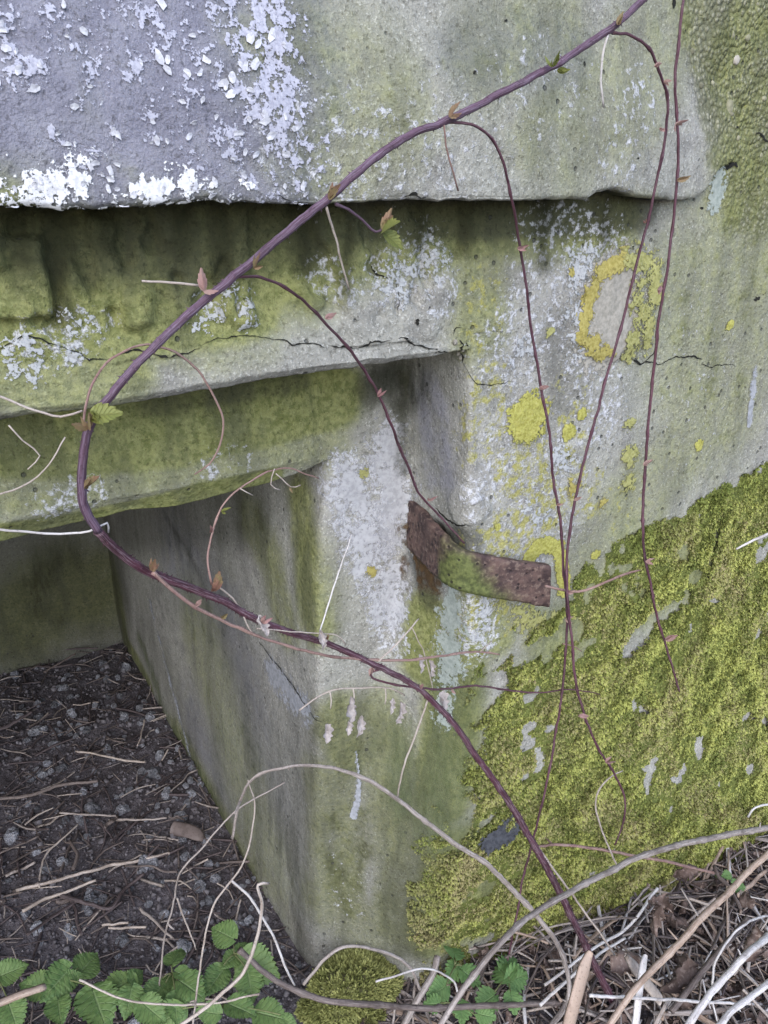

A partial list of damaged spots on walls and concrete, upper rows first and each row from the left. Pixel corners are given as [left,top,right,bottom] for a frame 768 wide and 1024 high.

peeling [0,0,337,206]
crack [1,335,508,386]
crack [631,353,737,368]
corrosion [397,525,442,595]